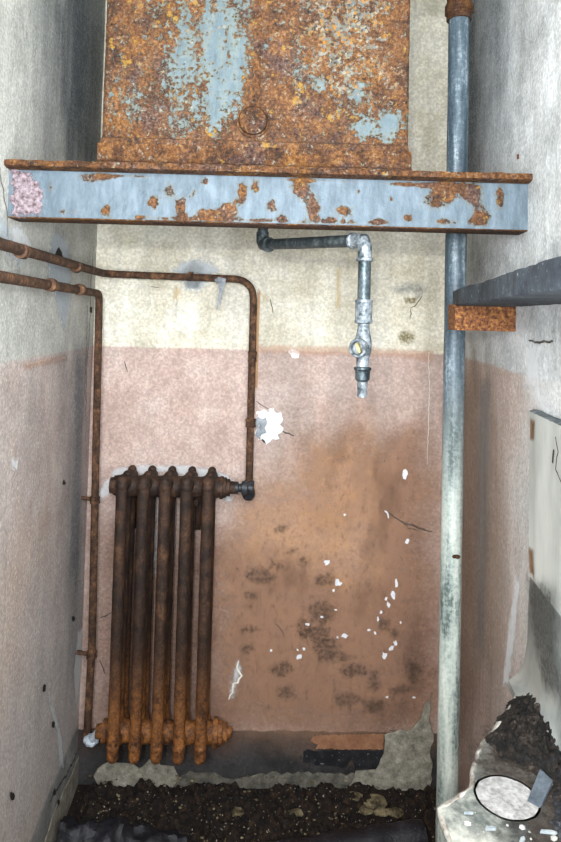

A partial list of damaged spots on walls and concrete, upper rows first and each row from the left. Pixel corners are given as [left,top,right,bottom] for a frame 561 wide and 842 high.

peeling [9,169,43,246]
spalling [255,401,294,444]